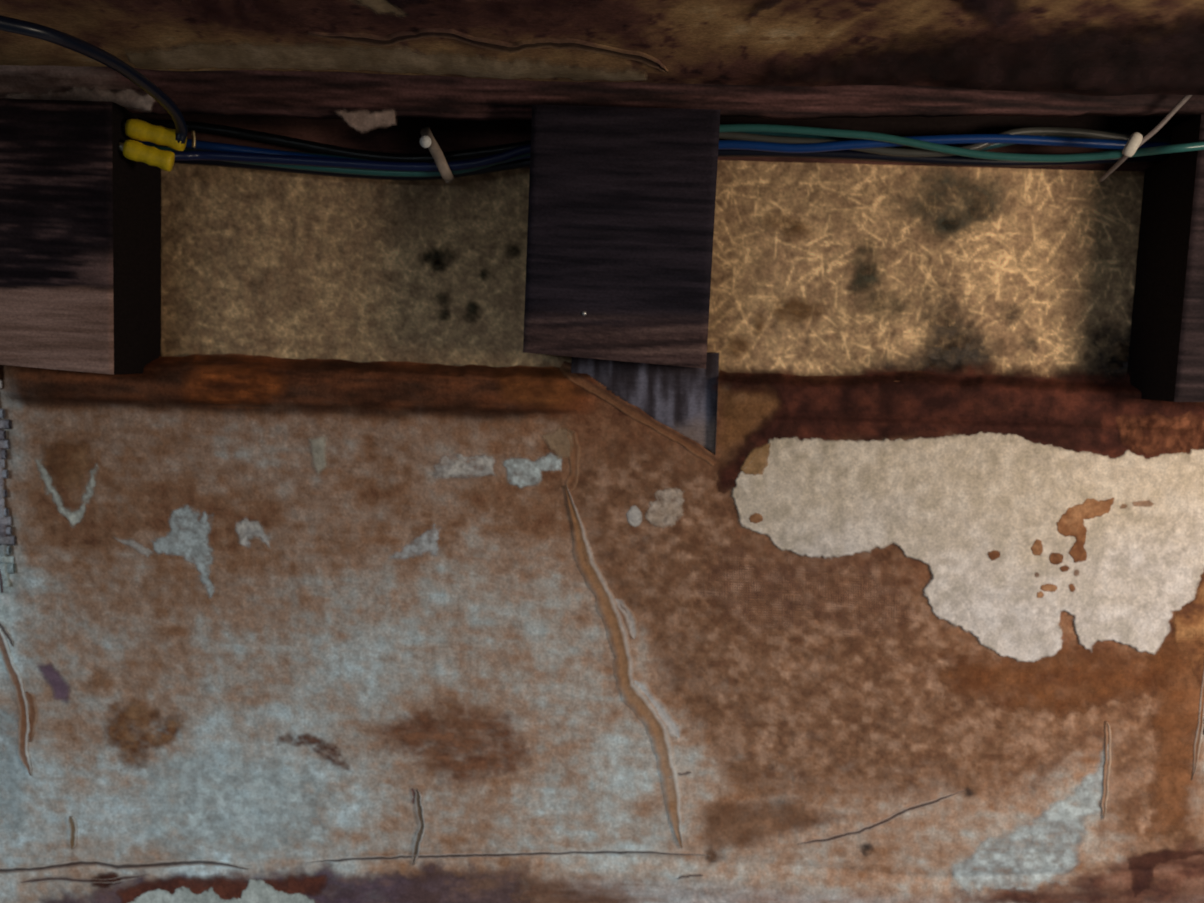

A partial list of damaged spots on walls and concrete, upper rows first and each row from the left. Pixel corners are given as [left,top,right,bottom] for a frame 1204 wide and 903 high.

water stain [962,0,1019,27]
water stain [423,249,454,272]
peeling [435,429,572,487]
peeling [120,506,214,597]
peeling [732,432,1204,662]
rust [1174,573,1204,686]
crack [0,622,39,776]
crack [0,816,249,887]
peeling [131,879,314,903]
crack [307,788,710,879]
crack [669,770,692,778]
peeling [953,721,1112,891]